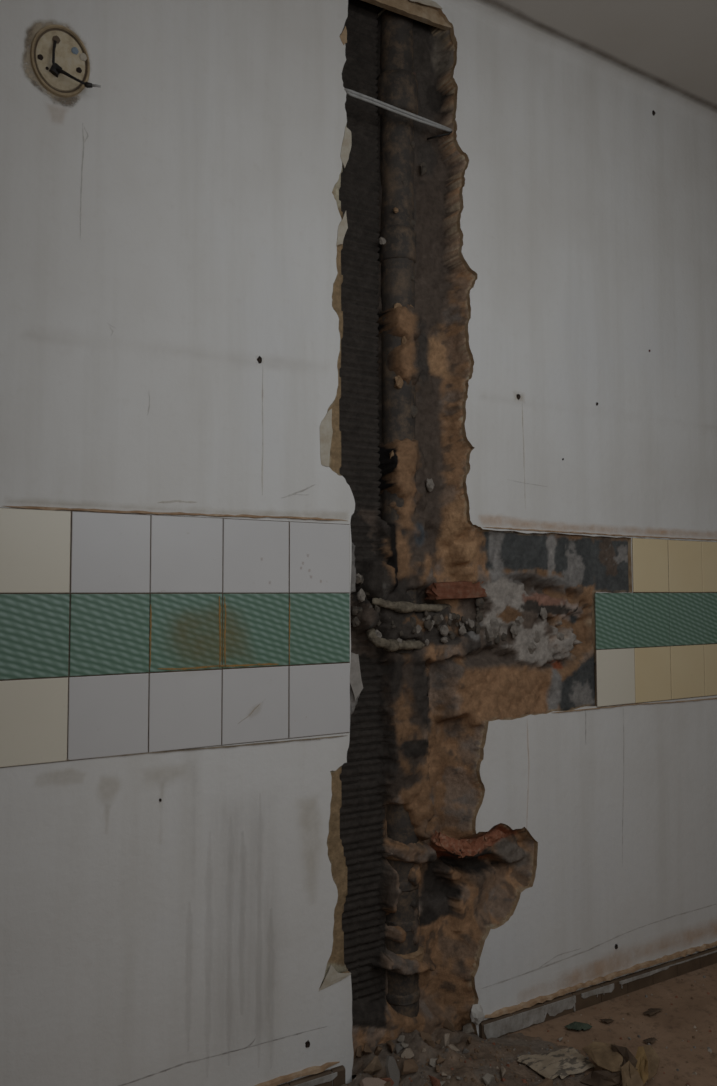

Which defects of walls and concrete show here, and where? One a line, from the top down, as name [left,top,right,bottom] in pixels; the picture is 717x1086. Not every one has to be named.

flaking render [319,0,717,1058]
flaking render [254,1062,339,1086]